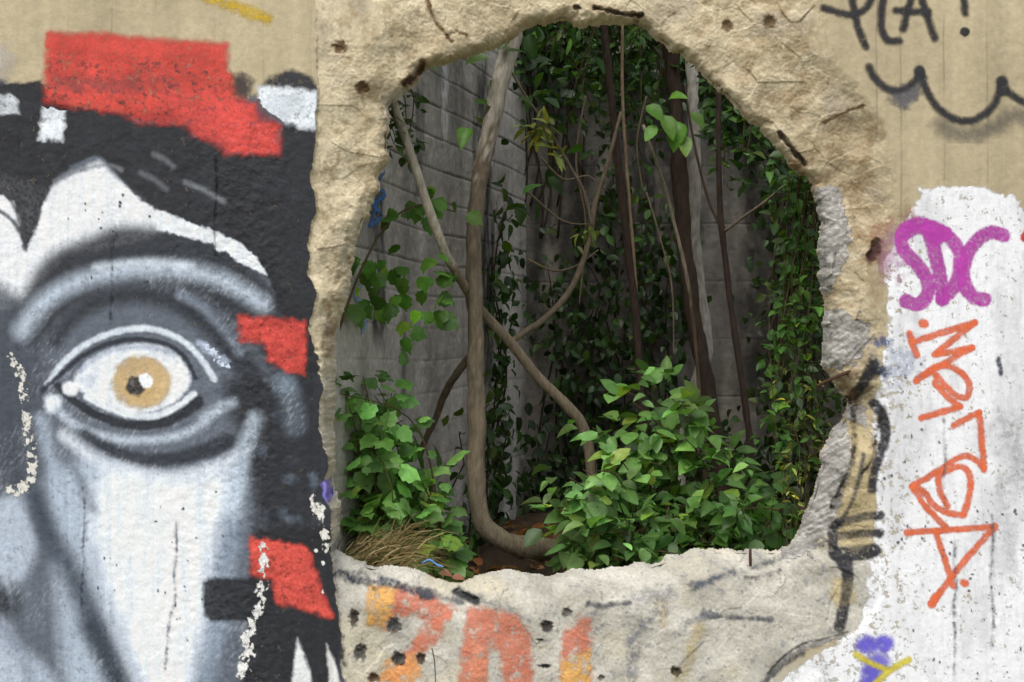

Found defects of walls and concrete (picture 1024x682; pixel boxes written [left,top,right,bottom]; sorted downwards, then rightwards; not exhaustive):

spalling [307,0,906,682]
peeling [5,352,38,497]
peeling [236,542,269,679]